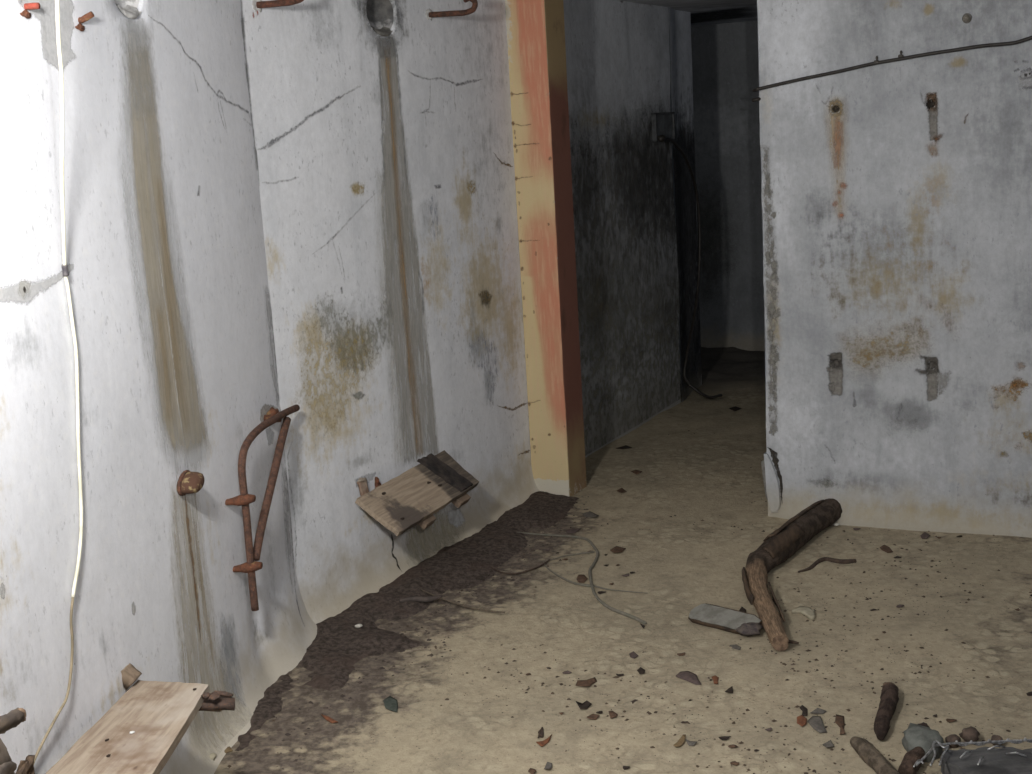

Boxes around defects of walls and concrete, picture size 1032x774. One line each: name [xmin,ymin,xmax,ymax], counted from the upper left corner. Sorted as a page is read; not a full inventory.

crack [153,2,342,174]
corrosion [830,100,843,169]
leakage [125,32,205,472]
leakage [301,38,438,461]
leakage [569,106,702,455]
crack [266,296,278,402]
spalling [826,353,843,396]
spalling [916,356,948,401]
corrosion [995,362,1028,401]
crack [284,474,297,565]
peeling [761,452,781,513]
corrosion [173,495,242,747]